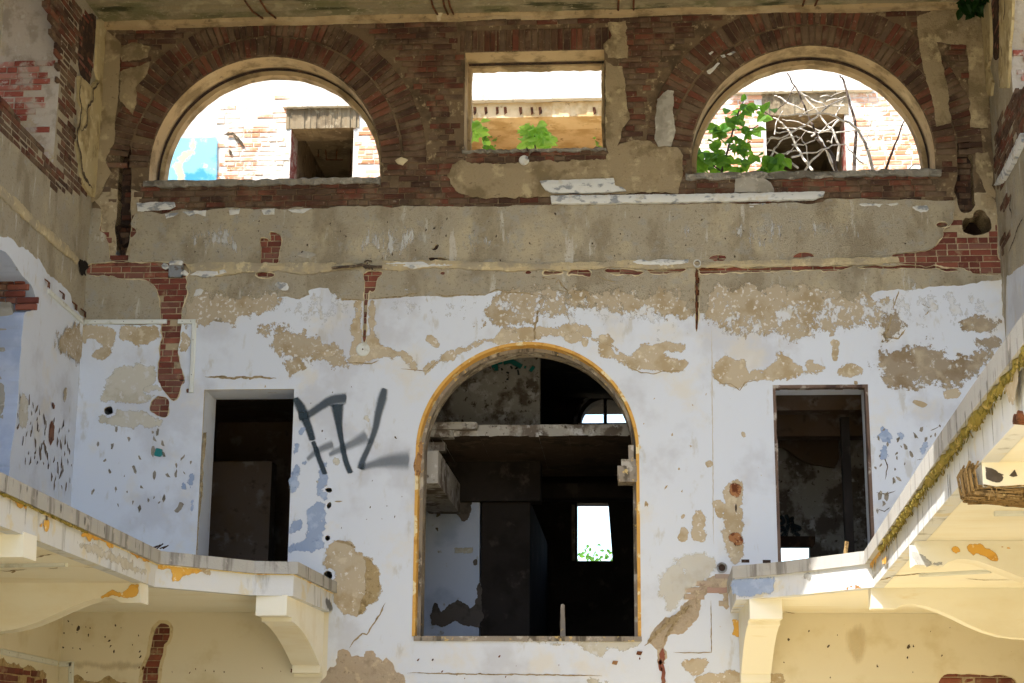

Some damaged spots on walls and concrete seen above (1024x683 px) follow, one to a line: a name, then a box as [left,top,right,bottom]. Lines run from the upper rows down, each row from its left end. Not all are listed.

crack [77,76,100,187]
peeling [0,0,1024,493]
leakage [869,305,1010,403]
peeling [288,457,340,553]
flaking render [523,479,745,664]
leakage [912,552,942,567]
flaking render [74,620,173,683]
crack [644,605,712,683]